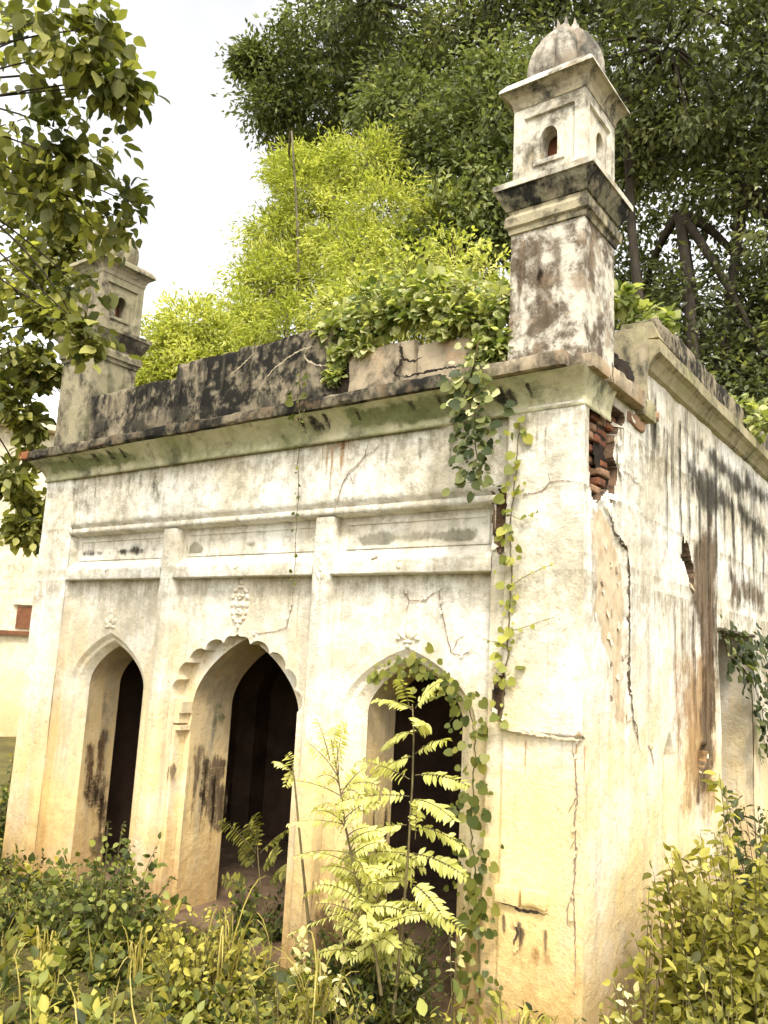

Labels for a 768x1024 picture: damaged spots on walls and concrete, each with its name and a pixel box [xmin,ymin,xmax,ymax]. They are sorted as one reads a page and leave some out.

damp [517,237,561,323]
damp [298,413,331,432]
crack [334,444,379,513]
crack [393,344,457,380]
flaking render [589,408,659,722]
crack [609,513,655,763]
damp [648,396,768,803]
damp [84,730,110,857]
damp [191,746,228,830]
crack [502,743,579,994]